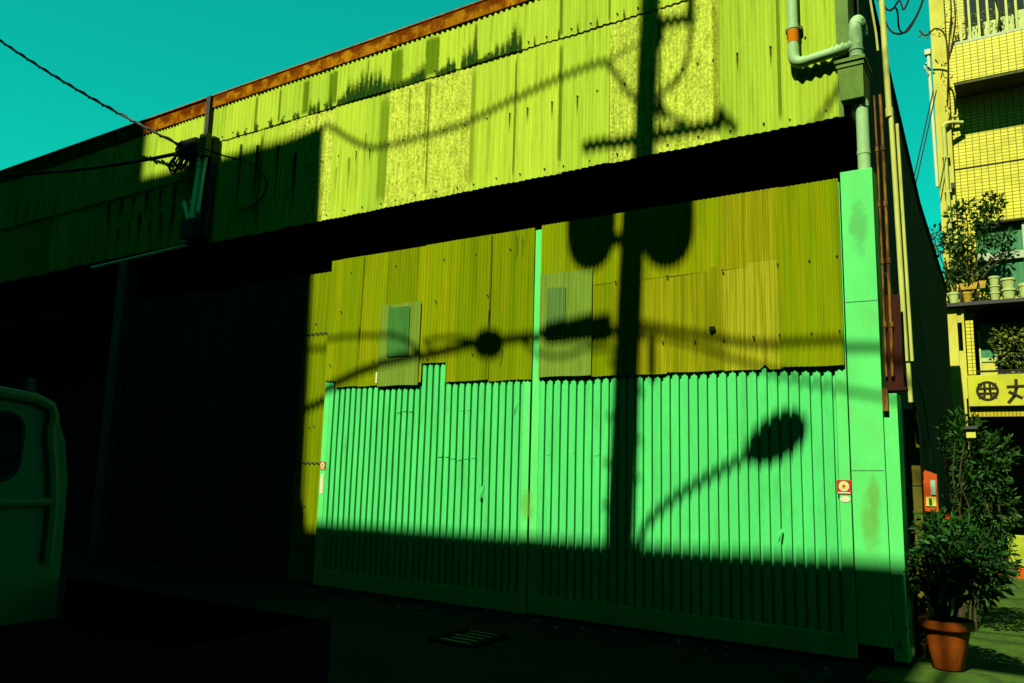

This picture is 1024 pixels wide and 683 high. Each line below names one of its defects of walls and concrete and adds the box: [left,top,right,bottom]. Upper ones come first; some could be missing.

rust [331,0,501,57]
rust [145,60,318,127]
leakage [236,25,522,223]